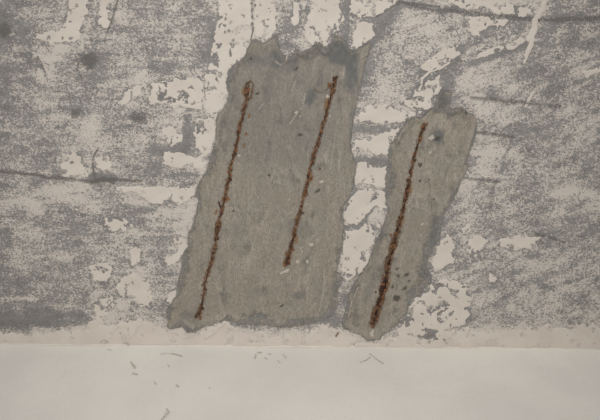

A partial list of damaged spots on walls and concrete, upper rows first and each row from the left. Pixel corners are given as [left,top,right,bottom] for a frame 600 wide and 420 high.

crack [0,150,142,184]
spalling [0,0,387,347]
corrosion [195,80,254,320]
corrosion [283,76,338,267]
corrosion [369,123,428,328]
spalling [342,75,600,349]